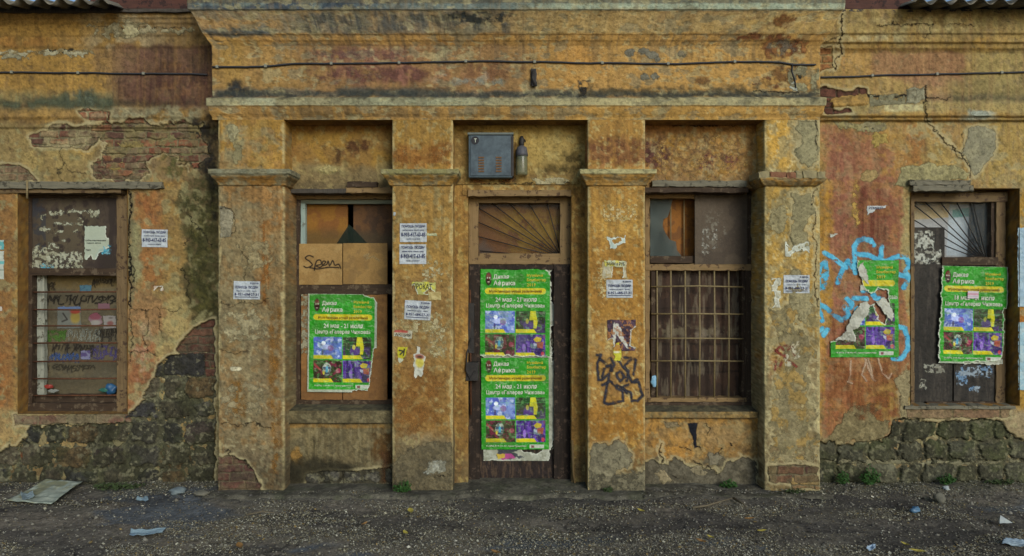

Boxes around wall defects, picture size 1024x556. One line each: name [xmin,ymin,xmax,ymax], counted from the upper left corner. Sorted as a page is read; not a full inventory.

crack [826,13,845,69]
flaking render [0,164,37,182]
flaking render [29,108,211,182]
flaking render [767,192,816,252]
peeling [645,46,951,182]
flaking render [852,170,878,226]
flaking render [894,111,996,187]
crack [923,94,971,176]
flaking render [588,269,1021,491]
flaking render [218,455,261,490]